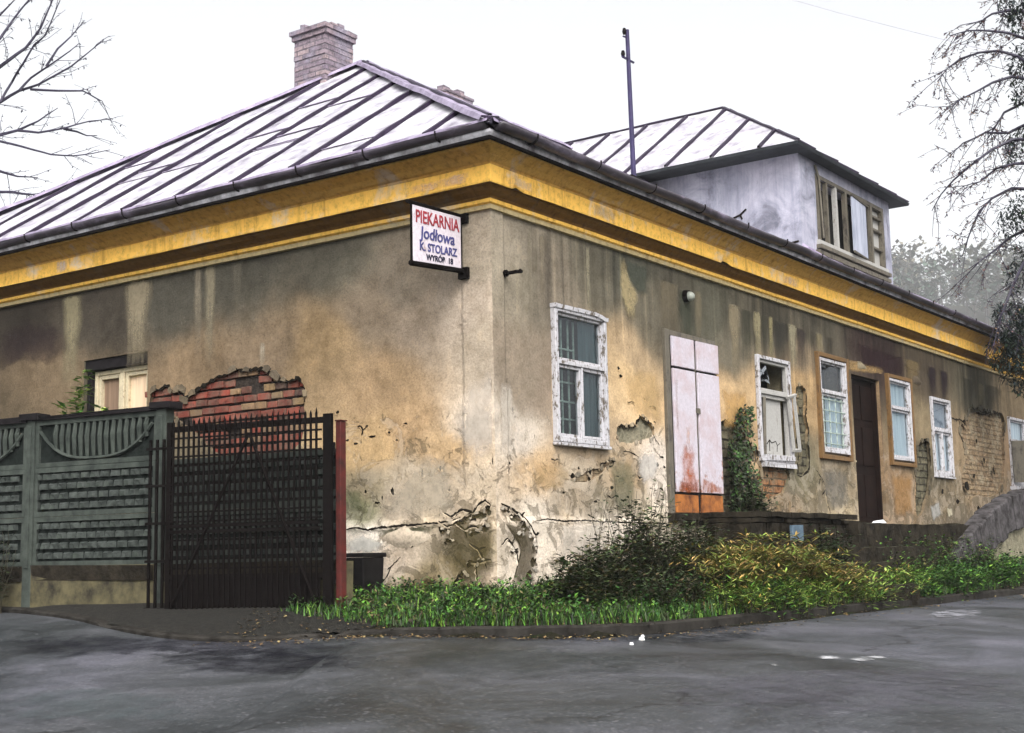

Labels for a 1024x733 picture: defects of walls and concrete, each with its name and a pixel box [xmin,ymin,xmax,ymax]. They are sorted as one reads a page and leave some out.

water stain [7,295,79,361]
water stain [128,280,149,348]
water stain [195,266,214,328]
water stain [729,305,804,357]
water stain [850,345,947,397]
flaking render [145,365,307,457]
flaking render [616,398,654,460]
corrosion [682,451,717,491]
flaking render [721,382,810,524]
flaking render [956,404,1006,510]
flaking render [439,505,538,583]
crack [346,495,669,589]